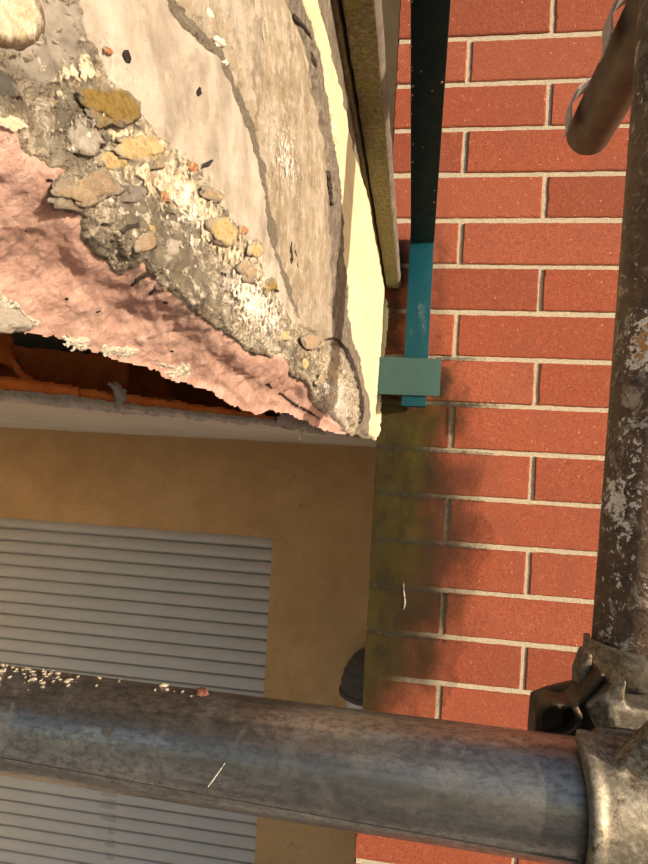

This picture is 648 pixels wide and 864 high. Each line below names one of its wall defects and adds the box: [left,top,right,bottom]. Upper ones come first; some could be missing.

spalling [0,0,371,440]
damp [370,583,452,619]